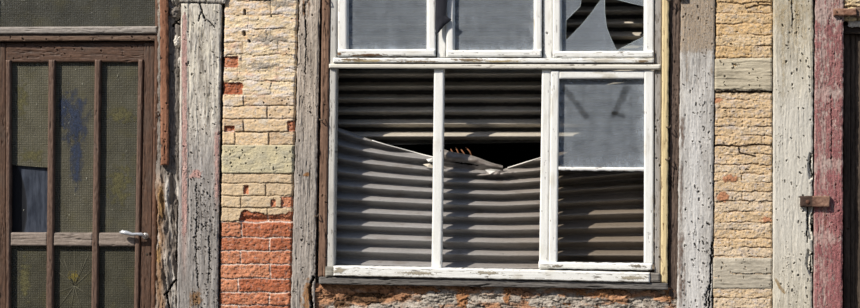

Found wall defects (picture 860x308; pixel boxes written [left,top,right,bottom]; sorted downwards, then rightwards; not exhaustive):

crack [172,0,215,28]
peeling [814,0,843,308]
spalling [333,292,390,308]
spalling [421,288,456,307]
spalling [523,294,573,308]